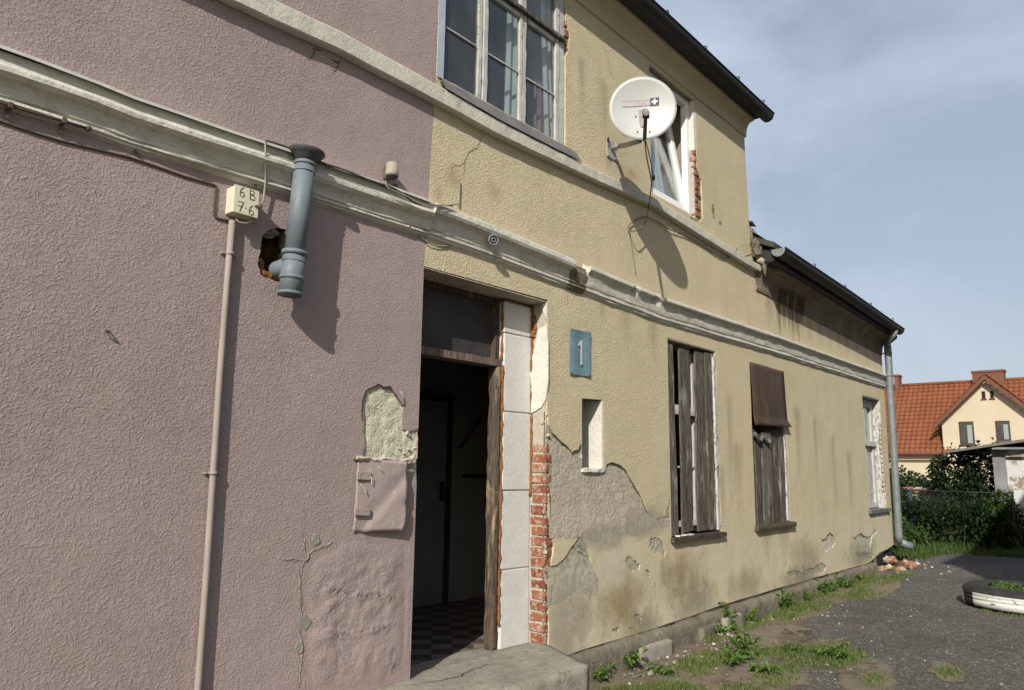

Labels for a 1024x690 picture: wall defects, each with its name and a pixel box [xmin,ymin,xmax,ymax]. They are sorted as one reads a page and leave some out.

spalling [361,384,418,480]
spalling [544,422,670,608]